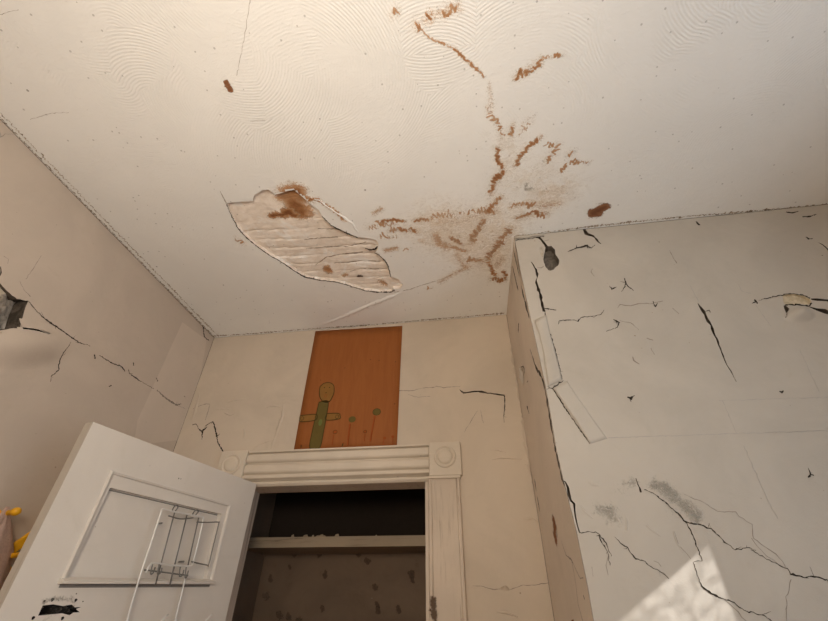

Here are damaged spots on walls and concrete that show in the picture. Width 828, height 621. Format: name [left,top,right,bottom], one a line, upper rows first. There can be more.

crack [0,112,504,340]
spalling [220,190,449,293]
spalling [538,237,559,271]
rust [587,203,611,218]
crack [516,203,827,252]
spalling [0,267,88,370]
crack [690,286,736,381]
flaking render [753,293,828,324]
crack [94,355,223,451]
crack [521,262,679,621]
crack [636,479,828,621]